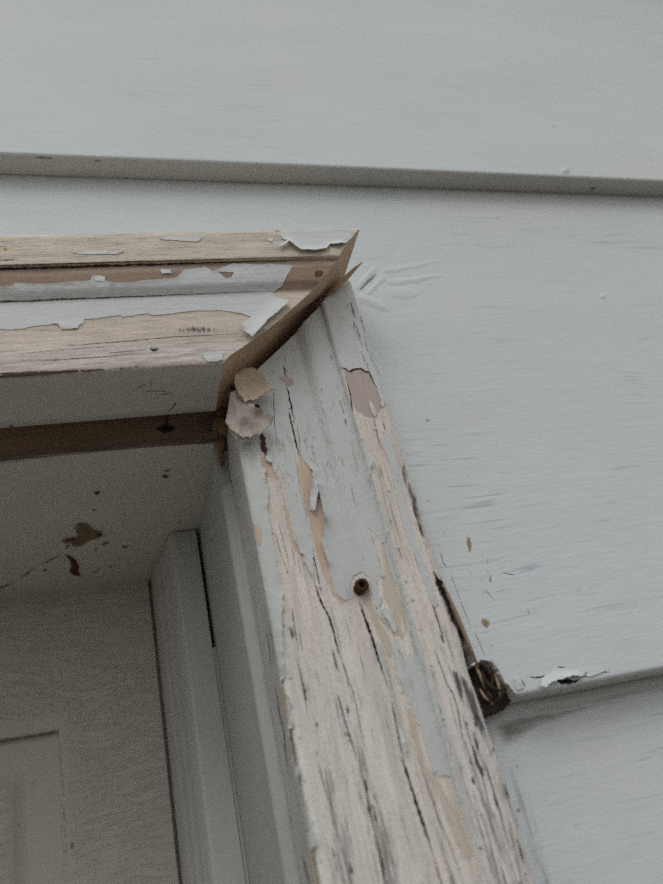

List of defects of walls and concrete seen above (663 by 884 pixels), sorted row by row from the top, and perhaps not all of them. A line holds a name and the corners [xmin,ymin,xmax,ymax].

peeling [267,228,353,250]
peeling [0,263,293,337]
peeling [201,352,223,362]
peeling [225,281,406,884]
peeling [540,668,605,687]